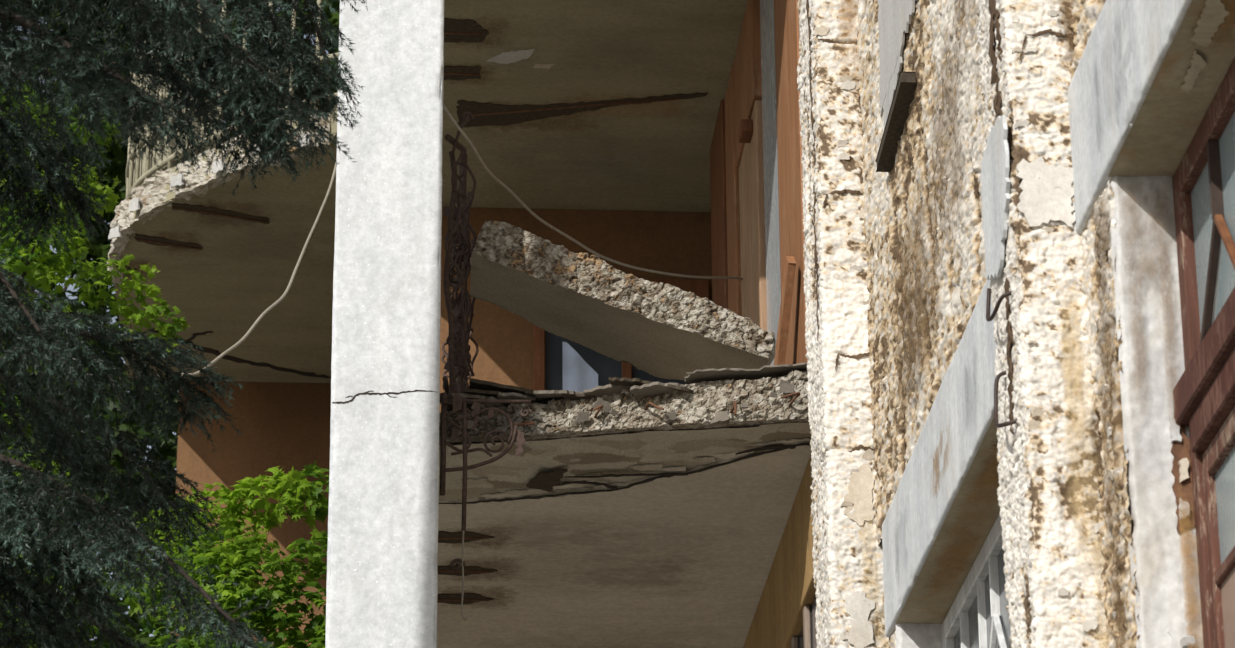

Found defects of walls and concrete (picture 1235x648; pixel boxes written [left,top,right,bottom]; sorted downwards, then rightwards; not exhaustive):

peeling [1181,0,1229,94]
spalling [107,115,335,284]
crack [148,328,435,404]
spalling [437,0,1140,648]
spalling [1169,415,1195,533]
peeling [1167,627,1195,648]